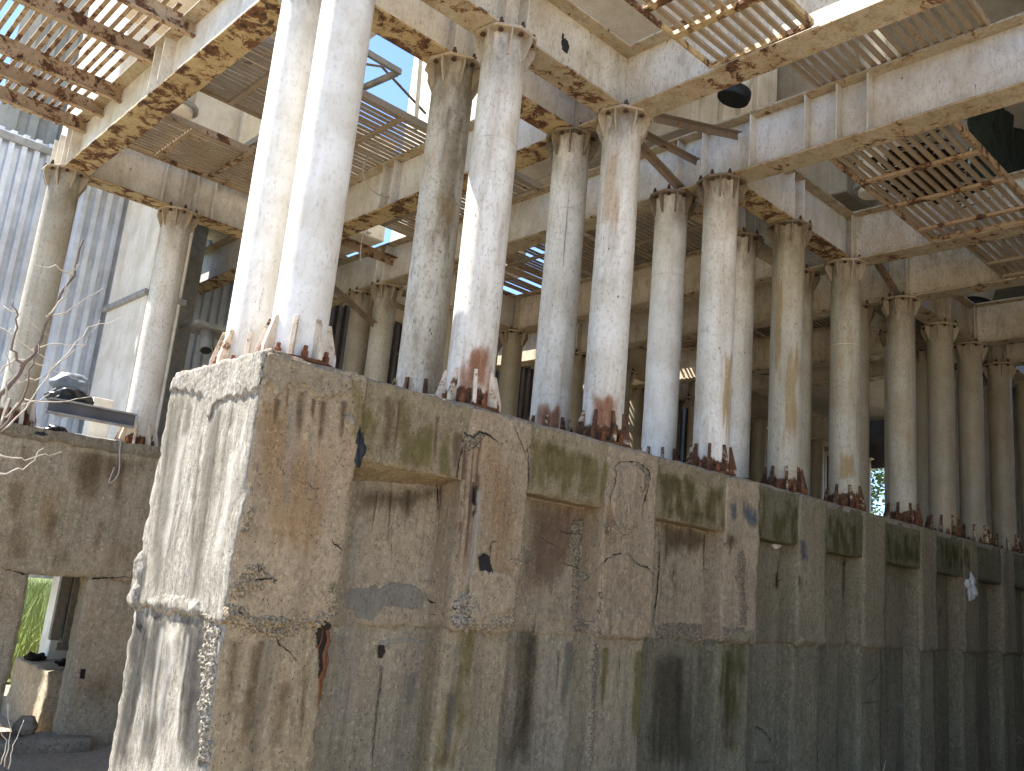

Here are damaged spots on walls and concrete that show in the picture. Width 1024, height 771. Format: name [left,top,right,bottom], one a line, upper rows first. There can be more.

spalling [197,563,342,765]
crack [436,429,530,508]
peeling [452,553,516,633]
crack [542,461,676,625]